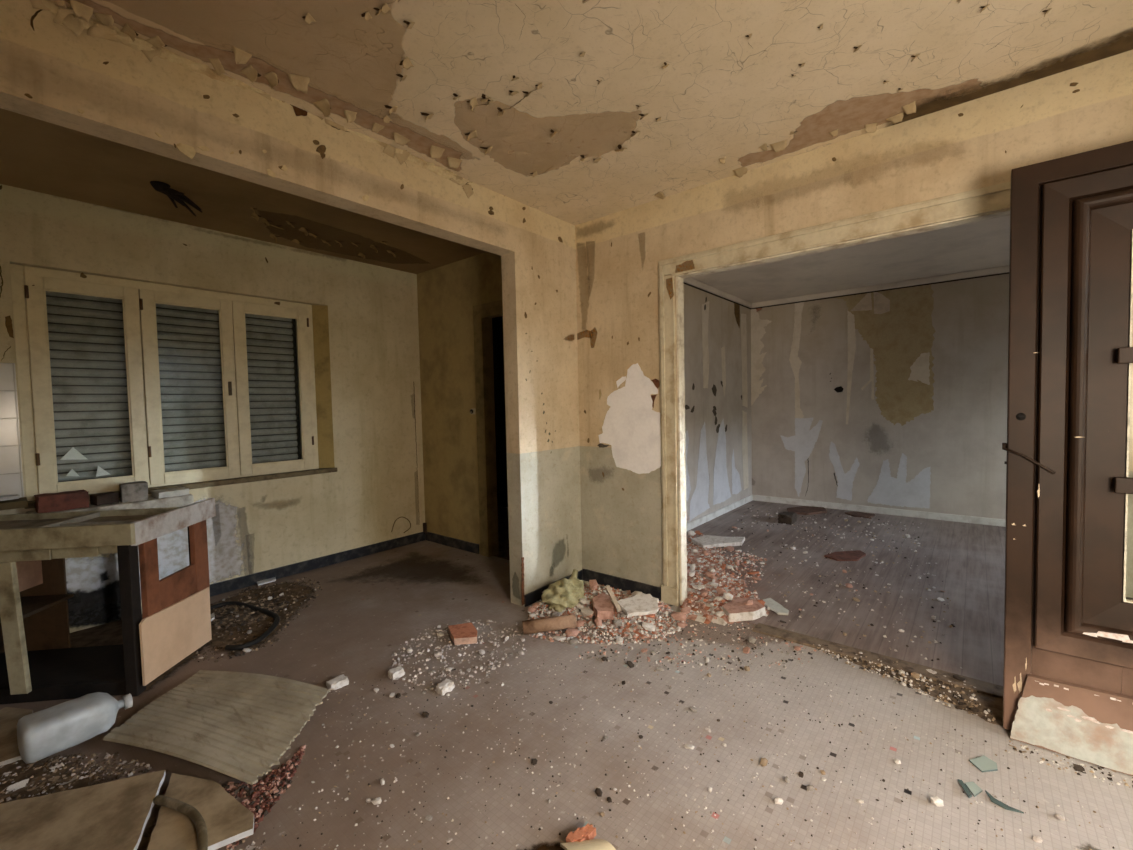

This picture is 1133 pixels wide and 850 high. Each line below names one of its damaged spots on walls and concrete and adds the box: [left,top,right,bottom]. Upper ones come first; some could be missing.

peeling [52,0,493,198]
peeling [453,93,505,116]
peeling [509,75,542,97]
peeling [614,105,661,152]
peeling [719,79,982,178]
peeling [712,381,727,433]
peeling [1009,695,1133,781]